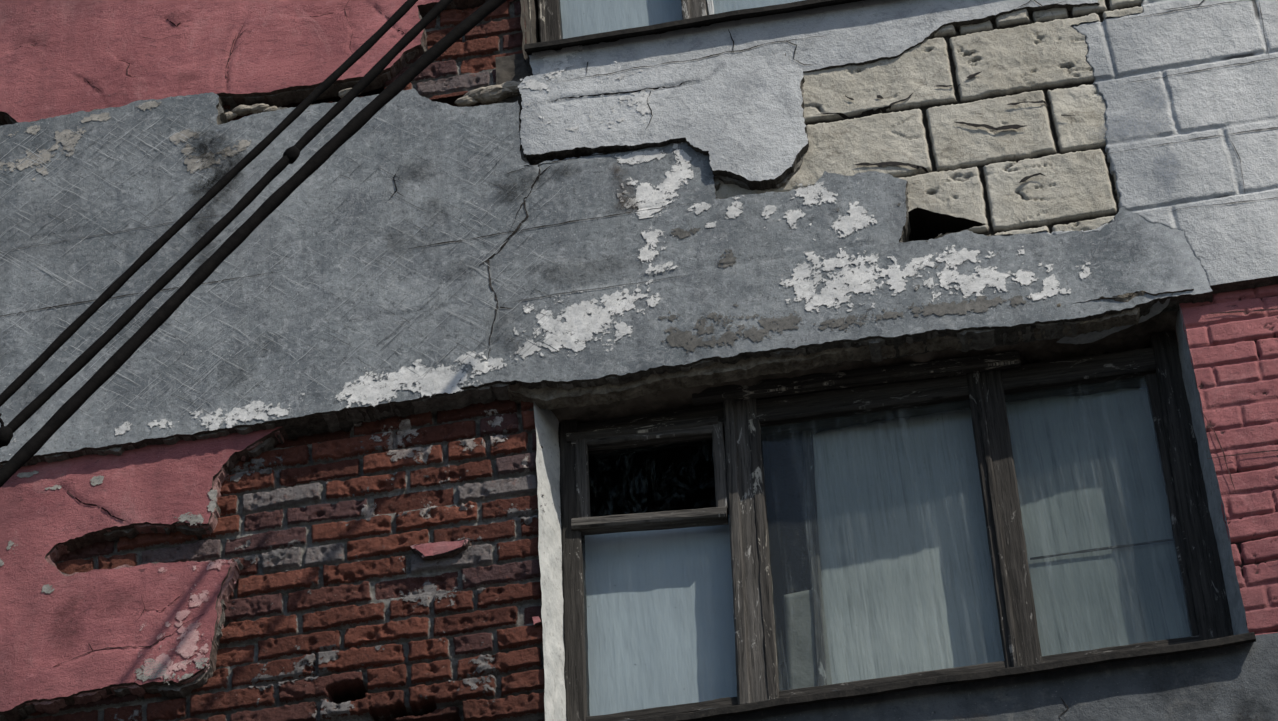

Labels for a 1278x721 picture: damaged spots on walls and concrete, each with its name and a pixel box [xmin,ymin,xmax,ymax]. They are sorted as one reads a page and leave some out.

flaking render [168,0,584,174]
peeling [566,92,651,132]
crack [403,29,827,359]
peeling [615,142,694,219]
spalling [688,0,1143,242]
flaking render [0,221,1213,721]